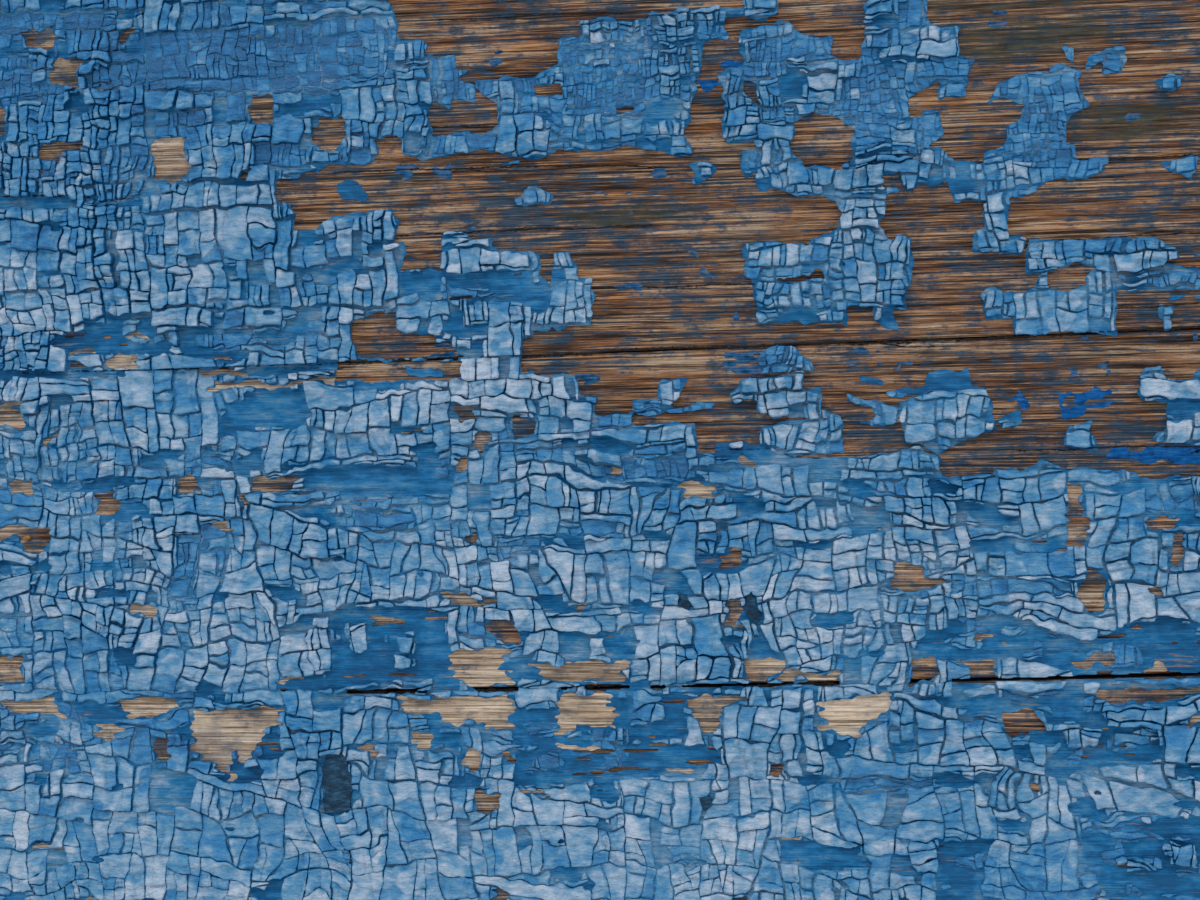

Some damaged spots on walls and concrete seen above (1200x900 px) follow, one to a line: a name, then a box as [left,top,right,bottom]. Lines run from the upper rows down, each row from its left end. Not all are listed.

peeling [717,0,1200,337]
crack [396,224,653,236]
crack [16,303,1200,374]
peeling [0,0,874,900]
peeling [1064,421,1098,453]
peeling [1137,366,1200,446]
peeling [541,345,1069,816]
crack [348,687,427,695]
crack [477,686,516,694]
crack [562,682,664,690]
crack [715,680,838,688]
peeling [780,467,1200,900]